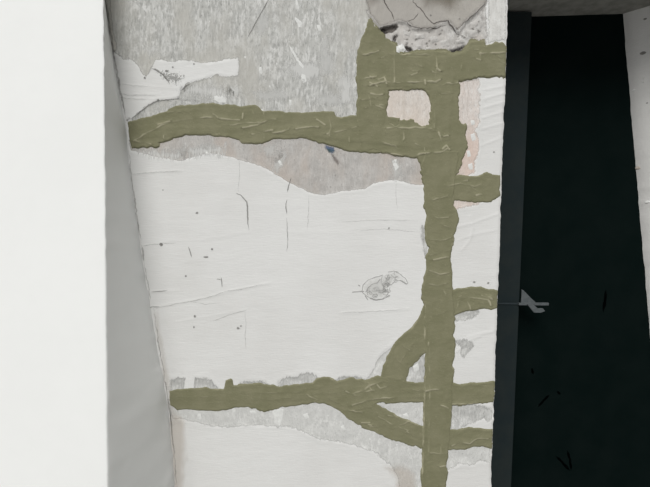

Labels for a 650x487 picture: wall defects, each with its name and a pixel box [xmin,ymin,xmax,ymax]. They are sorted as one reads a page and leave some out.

crack [384,0,481,36]
flaking render [105,0,507,126]
flaking render [457,79,481,176]
flaking render [129,135,423,195]
flaking render [171,377,185,390]
flaking render [194,378,217,389]
flaking render [279,373,317,387]
flaking render [450,404,492,430]
flaking render [168,400,423,487]